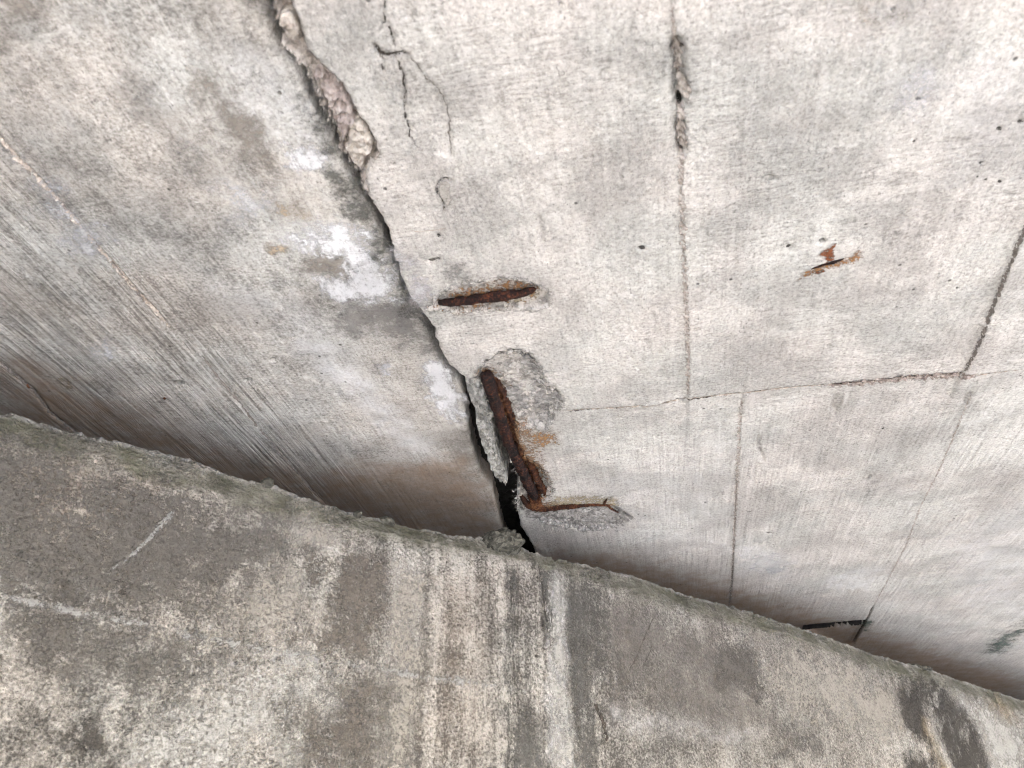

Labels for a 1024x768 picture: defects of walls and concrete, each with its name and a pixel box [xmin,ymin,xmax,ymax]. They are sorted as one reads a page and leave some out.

crack [376,1,452,150]
crack [412,177,452,232]
rust [433,279,540,313]
crack [567,3,1024,639]
rust [800,243,861,279]
spalling [476,349,569,443]
rust [477,363,618,510]
crack [466,385,543,586]
spalling [510,456,635,532]